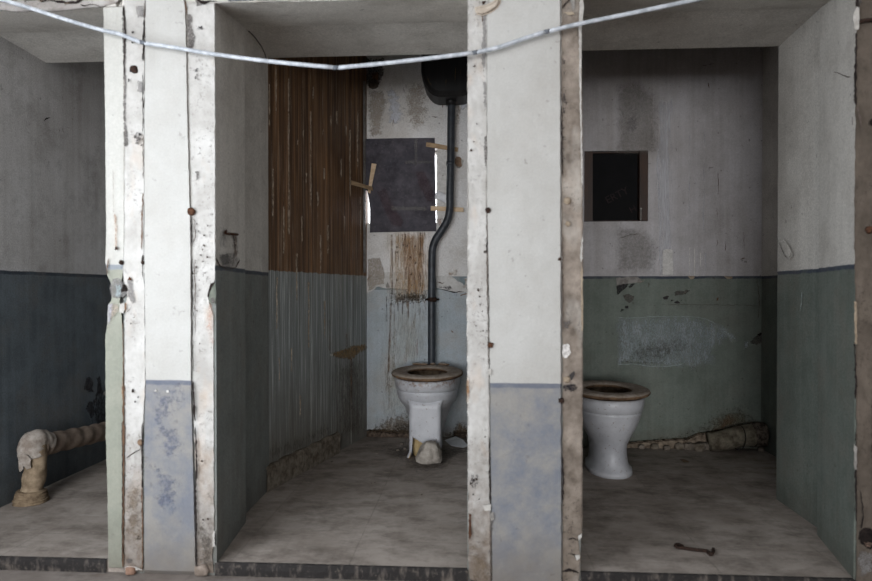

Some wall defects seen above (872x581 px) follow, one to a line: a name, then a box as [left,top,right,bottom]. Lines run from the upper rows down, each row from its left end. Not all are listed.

crack [23,0,101,8]
spalling [0,0,146,571]
spalling [184,0,312,573]
corrosion [386,233,425,308]
spalling [366,0,494,581]
spalling [561,0,583,581]
peeling [616,277,642,312]
spalling [853,0,872,581]